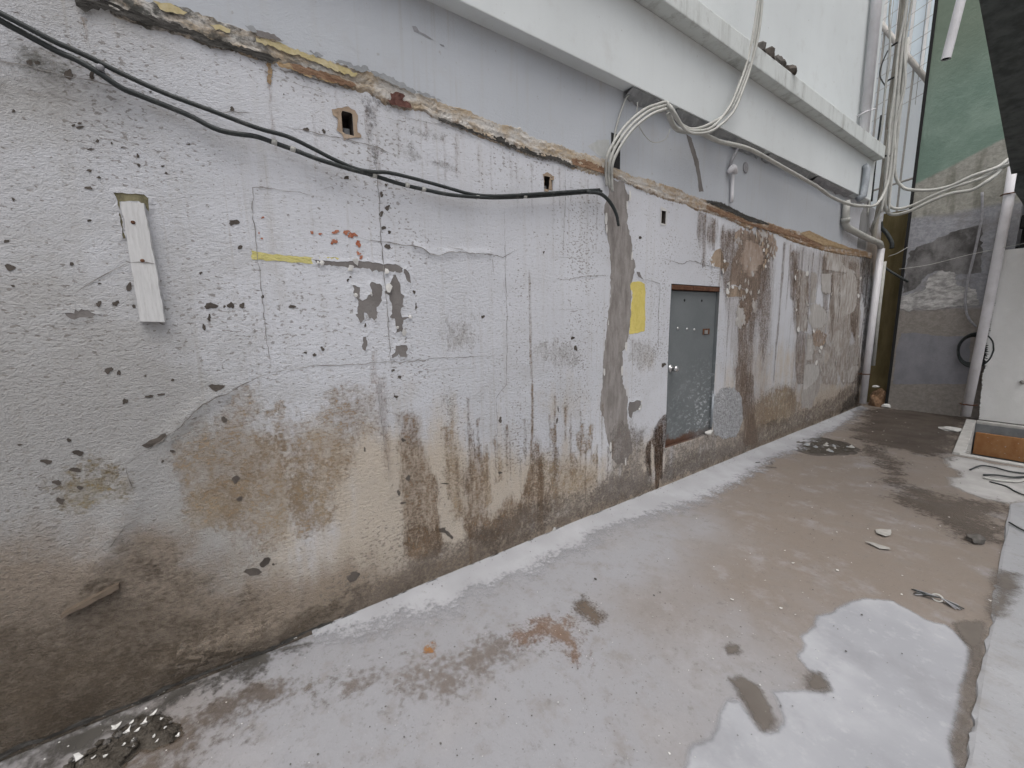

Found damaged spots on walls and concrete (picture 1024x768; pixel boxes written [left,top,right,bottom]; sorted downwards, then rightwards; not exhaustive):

leakage [174,389,372,546]
crack [126,126,512,488]
spalling [75,0,872,408]
leakage [344,257,873,616]
leakage [2,640,312,768]